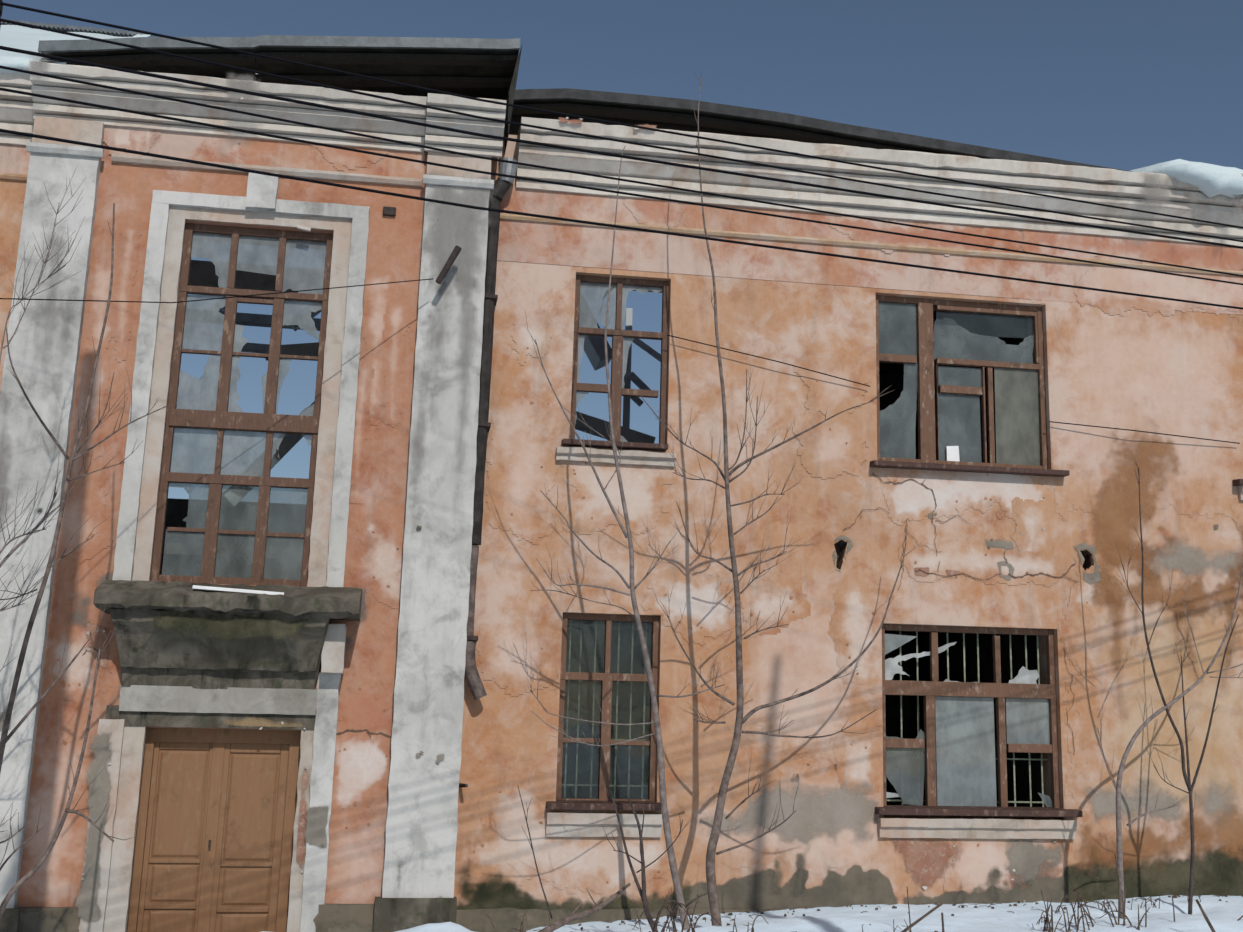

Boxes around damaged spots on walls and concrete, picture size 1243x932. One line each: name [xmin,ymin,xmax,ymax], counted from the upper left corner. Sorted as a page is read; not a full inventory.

peeling [828,535,885,685]
crack [843,473,1079,590]
peeling [883,468,1118,622]
damp [1147,540,1243,575]
peeling [75,734,112,922]
peeling [297,679,394,908]
crack [336,729,392,739]